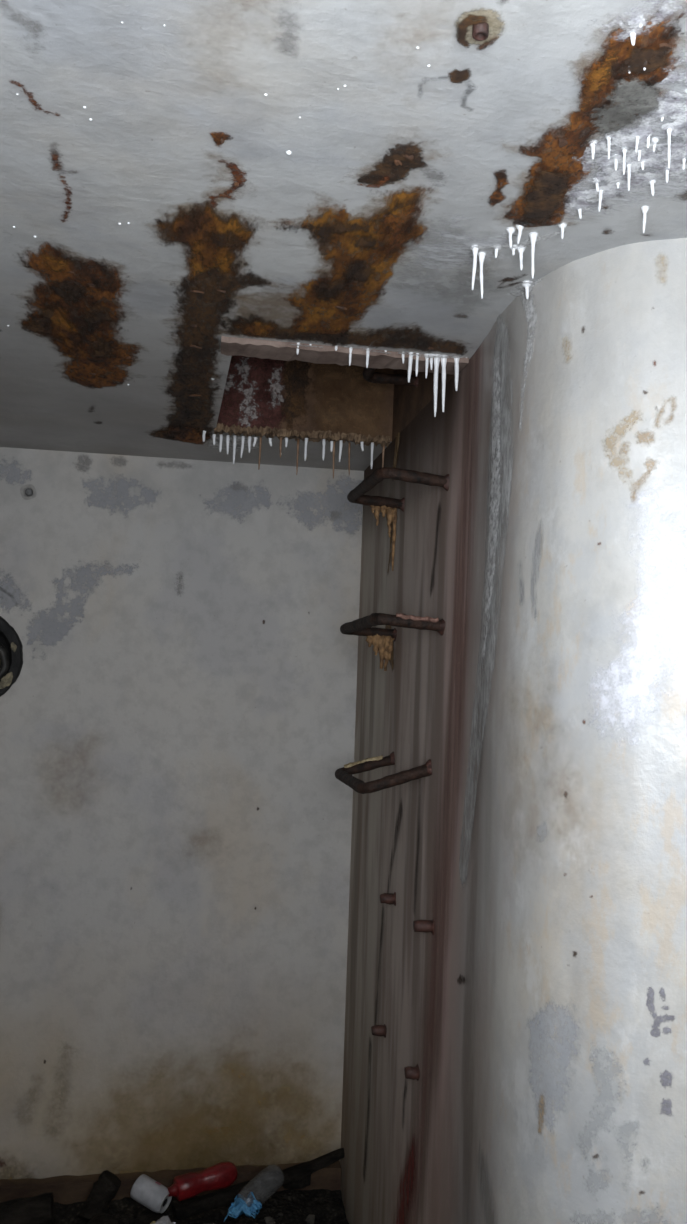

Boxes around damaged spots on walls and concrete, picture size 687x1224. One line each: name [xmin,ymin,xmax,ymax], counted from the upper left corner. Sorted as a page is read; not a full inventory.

spalling [456,9,504,50]
rust [210,132,232,146]
rust [489,13,687,227]
rust [20,242,139,388]
rust [151,142,478,444]
damp [335,346,467,417]
damp [421,52,687,884]
rust [370,505,397,572]
rust [365,613,439,671]
rust [344,755,383,768]
rust [396,856,446,1224]